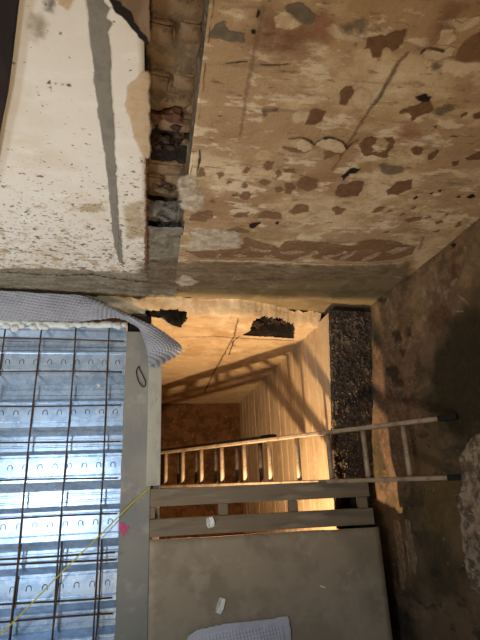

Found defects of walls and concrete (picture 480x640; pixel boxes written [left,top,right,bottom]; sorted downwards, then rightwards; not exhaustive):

peeling [420,16,480,63]
crack [356,55,406,131]
peeling [399,94,433,121]
flaking render [0,0,424,298]
water stain [118,204,143,263]
spalling [145,309,188,327]
spalling [243,315,295,338]
crack [204,321,283,392]